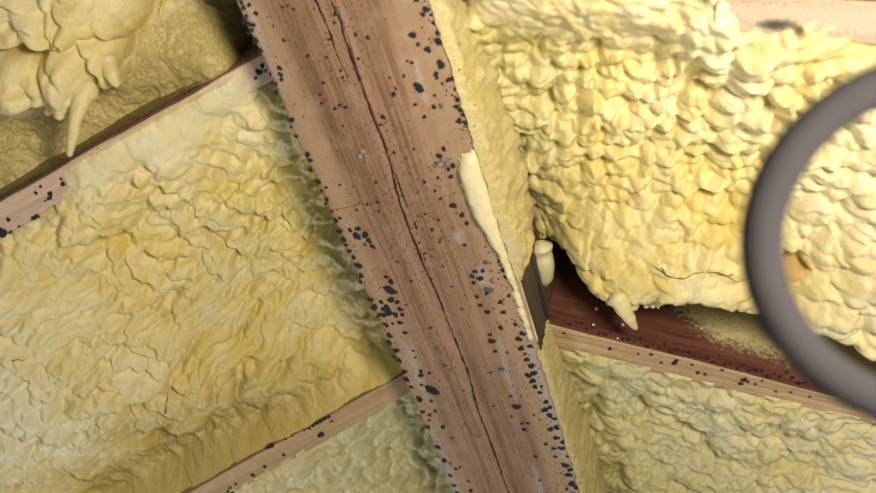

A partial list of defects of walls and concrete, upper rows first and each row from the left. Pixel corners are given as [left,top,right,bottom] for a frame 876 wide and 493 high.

leakage [237,0,294,96]
leakage [0,217,21,252]
crack [314,0,509,493]
leakage [303,0,581,493]
leakage [784,251,809,281]
leakage [562,320,808,393]
leakage [284,415,334,440]